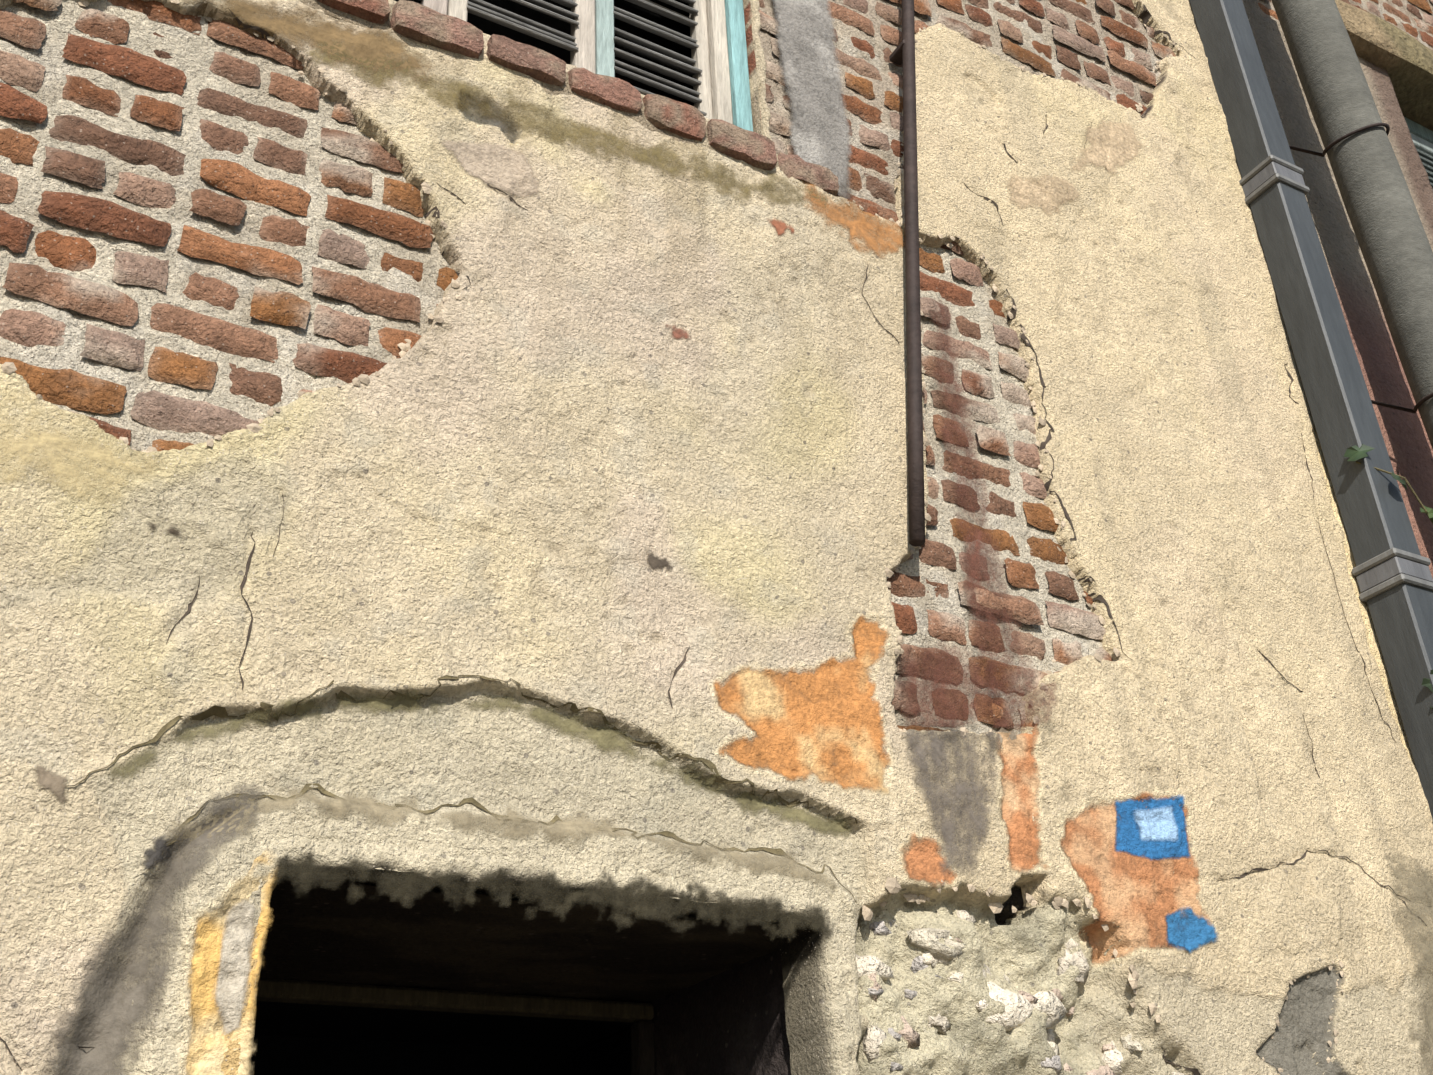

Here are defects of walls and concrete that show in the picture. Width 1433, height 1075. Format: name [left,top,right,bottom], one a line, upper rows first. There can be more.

flaking render [0,0,462,453]
flaking render [714,0,1187,871]
crack [166,576,200,644]
crack [239,494,284,689]
flaking render [855,792,1211,1075]
flaking render [1256,961,1348,1075]
crack [1216,850,1431,926]